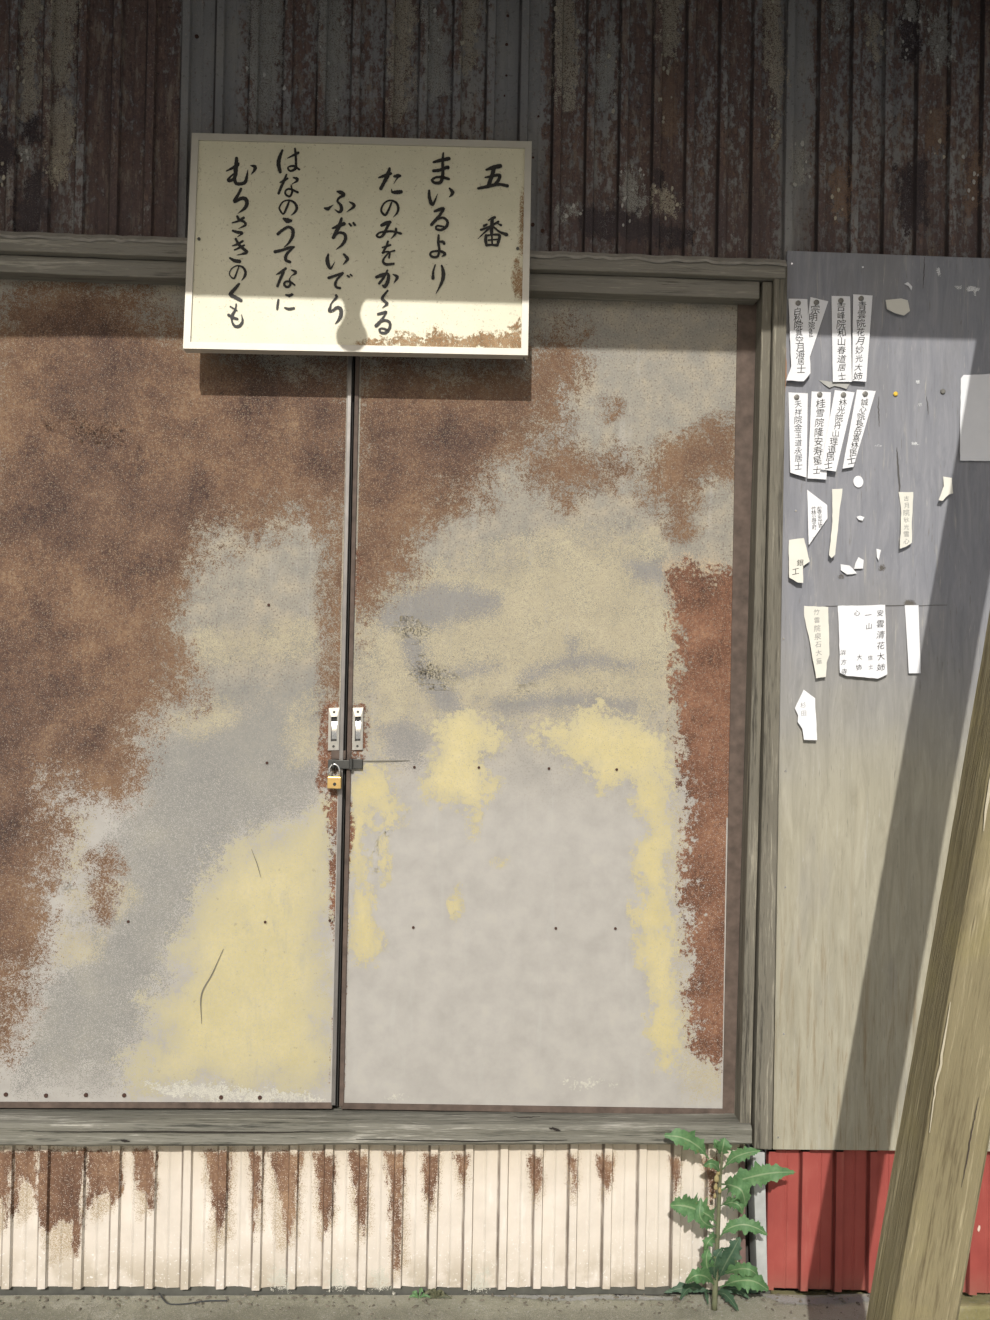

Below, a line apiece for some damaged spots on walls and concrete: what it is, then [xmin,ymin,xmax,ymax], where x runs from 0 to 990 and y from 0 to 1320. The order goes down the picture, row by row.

peeling [0,0,83,192]
peeling [384,0,453,128]
peeling [548,0,623,117]
peeling [759,0,792,151]
peeling [823,0,956,75]
peeling [618,164,684,227]
rust [0,187,736,1077]
rust [0,1145,163,1269]
rust [199,1146,474,1282]
rust [525,1151,548,1209]
rust [563,1150,618,1206]